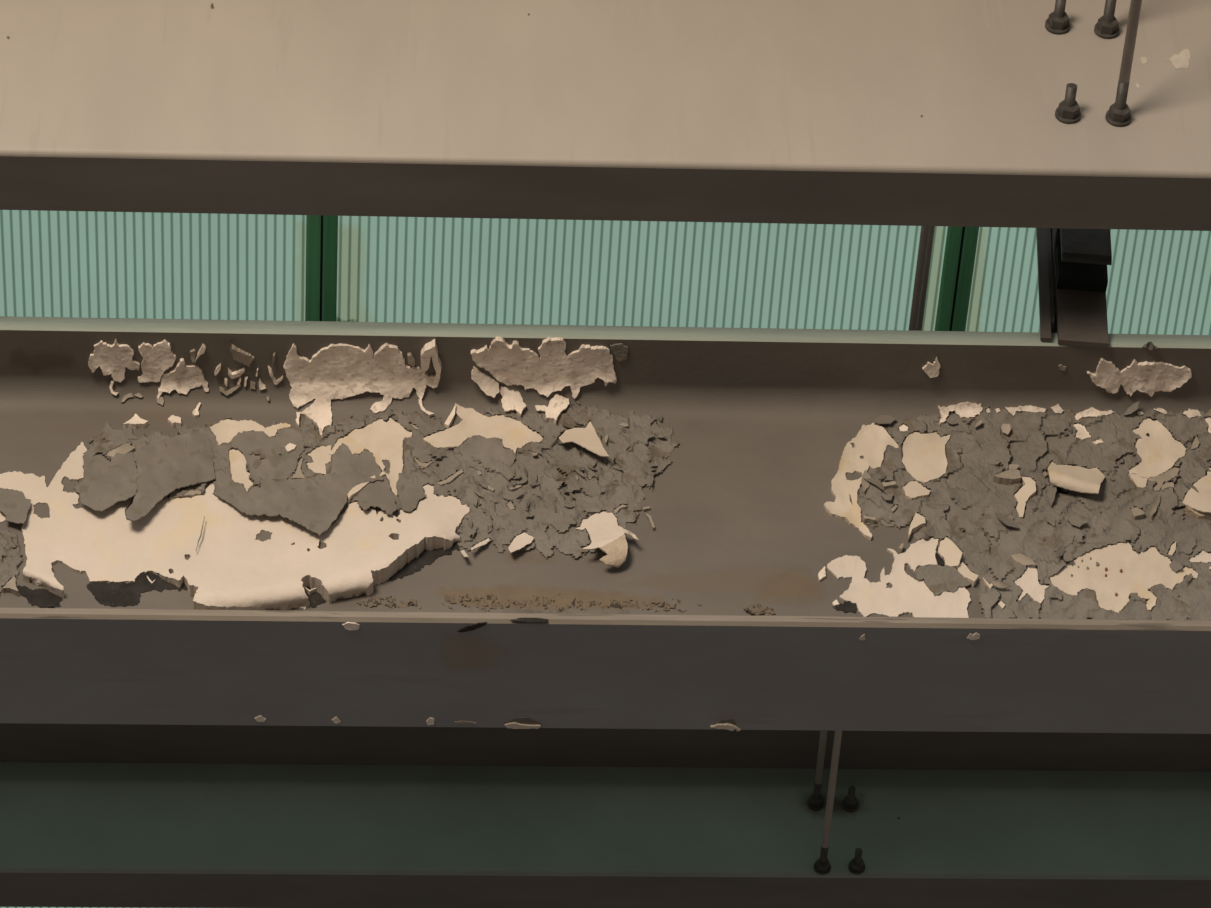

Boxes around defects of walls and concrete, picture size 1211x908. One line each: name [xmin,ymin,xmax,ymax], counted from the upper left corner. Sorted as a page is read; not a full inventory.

peeling [0,336,680,611]
peeling [818,342,1211,620]
peeling [504,717,542,729]
peeling [710,718,740,731]